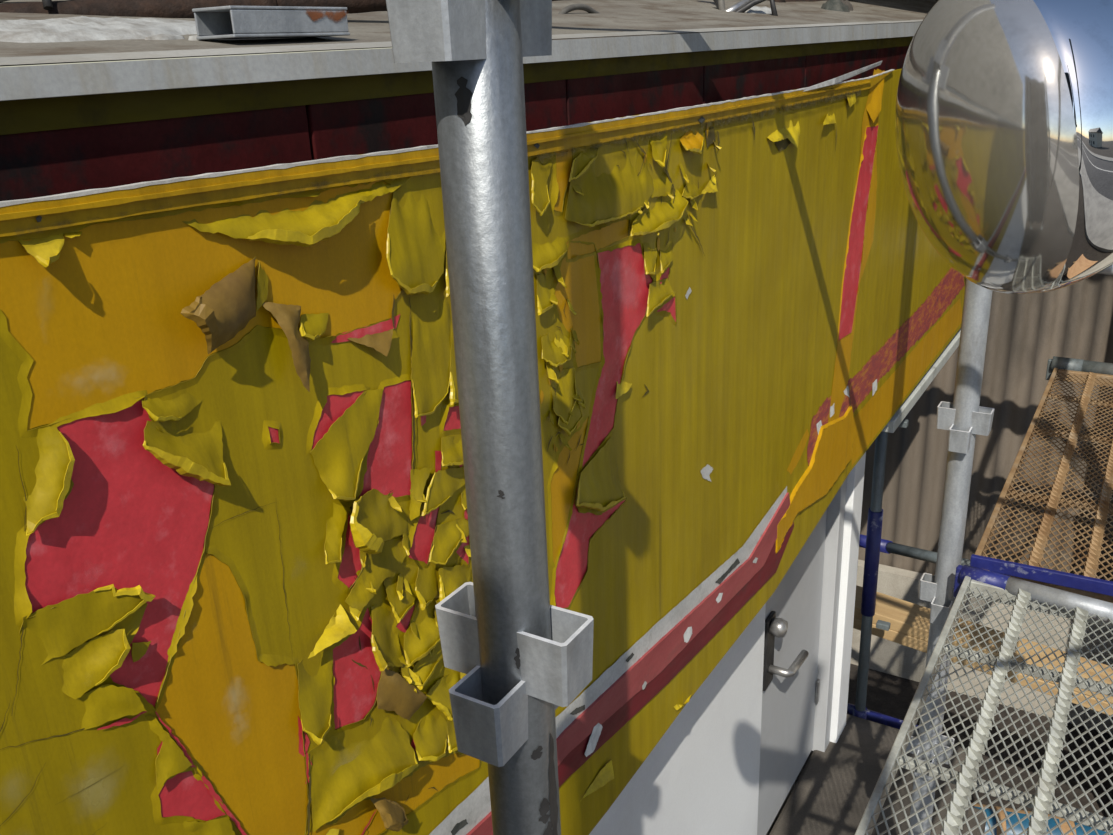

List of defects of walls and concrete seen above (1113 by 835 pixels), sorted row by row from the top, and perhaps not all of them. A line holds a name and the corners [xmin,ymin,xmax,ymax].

crack [0,632,108,826]
peeling [0,177,482,835]
peeling [531,122,722,610]
peeling [767,120,800,151]
peeling [775,69,965,553]